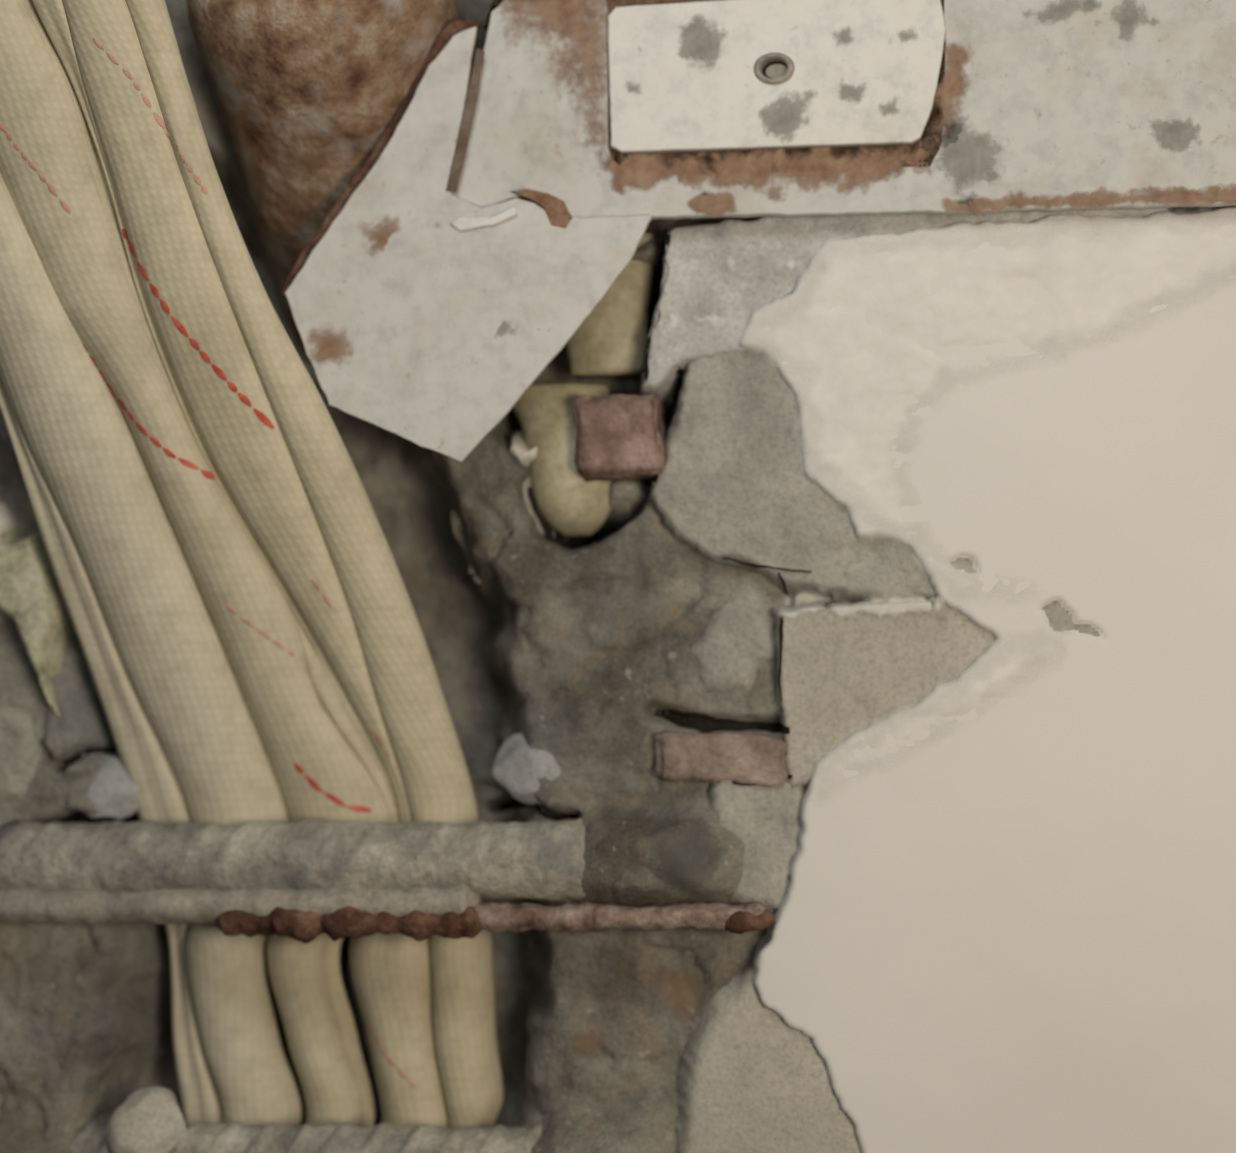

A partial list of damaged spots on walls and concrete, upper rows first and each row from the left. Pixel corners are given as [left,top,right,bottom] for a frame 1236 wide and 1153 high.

rust [280,20,481,298]
rust [602,44,968,216]
rust [944,185,1236,214]
rust [310,331,352,361]
spalling [0,408,40,539]
spalling [165,0,1236,913]
spalling [0,612,139,832]
crack [654,557,812,734]
crack [733,775,792,786]
spalling [0,922,188,1153]
spalling [340,937,383,1126]
spalling [492,928,861,1153]